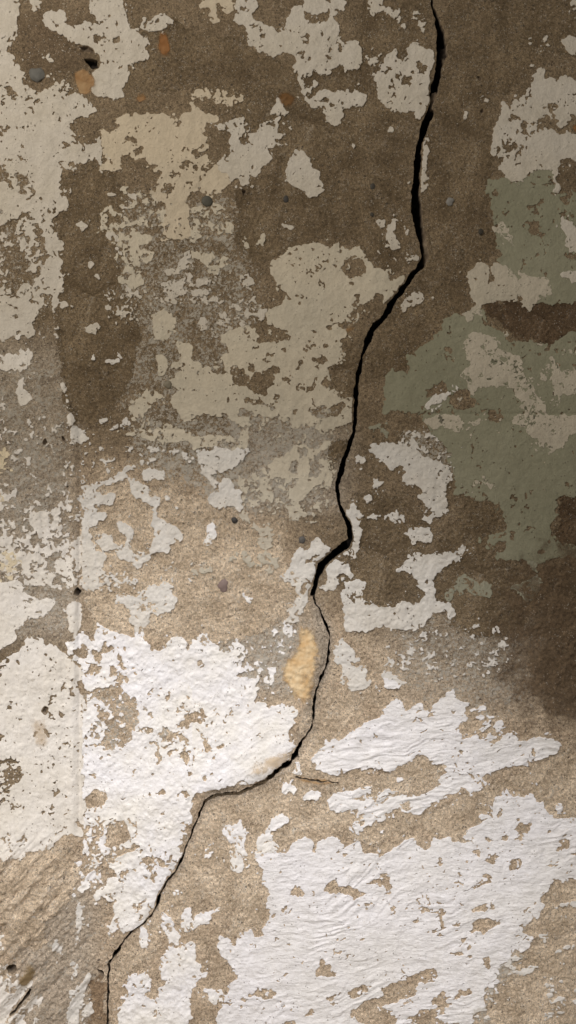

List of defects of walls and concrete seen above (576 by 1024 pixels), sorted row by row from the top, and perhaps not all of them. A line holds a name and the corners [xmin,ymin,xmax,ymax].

peeling [143,250,229,341]
peeling [0,346,37,373]
peeling [15,376,32,411]
peeling [0,396,37,485]
peeling [139,444,165,483]
peeling [0,483,18,511]
crack [97,0,448,1024]
peeling [264,661,277,694]
peeling [381,643,438,689]
peeling [75,902,89,945]
peeling [0,964,43,1024]
flaking render [66,973,110,1024]